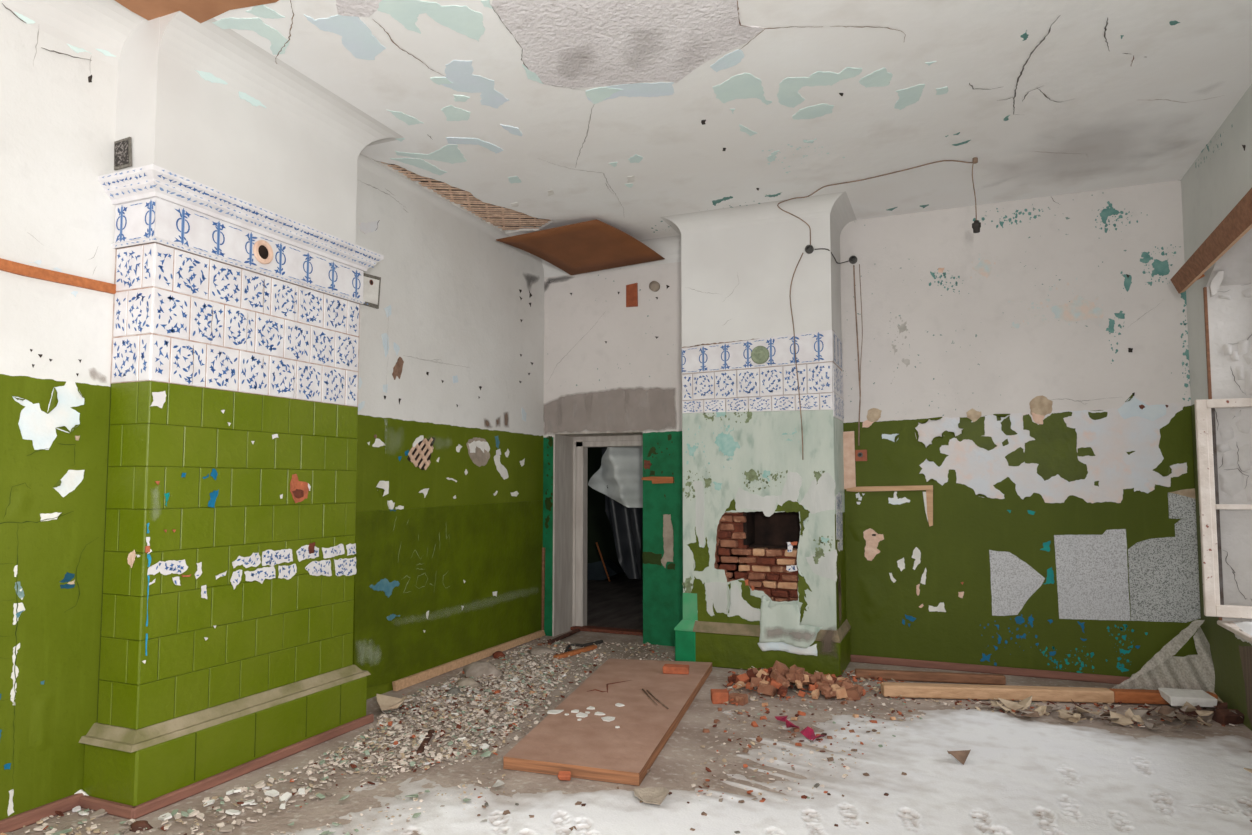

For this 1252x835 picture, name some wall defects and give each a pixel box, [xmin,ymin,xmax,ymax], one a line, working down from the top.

flaking render [304,0,948,136]
crack [969,18,1068,115]
crack [1104,18,1134,62]
peeling [1095,201,1148,233]
peeling [12,381,85,450]
flaking render [862,408,900,442]
peeling [642,409,864,656]
flaking render [863,528,884,561]
peeling [888,492,910,505]
peeling [914,291,1201,673]
peeling [127,523,357,664]
peeling [889,547,946,627]